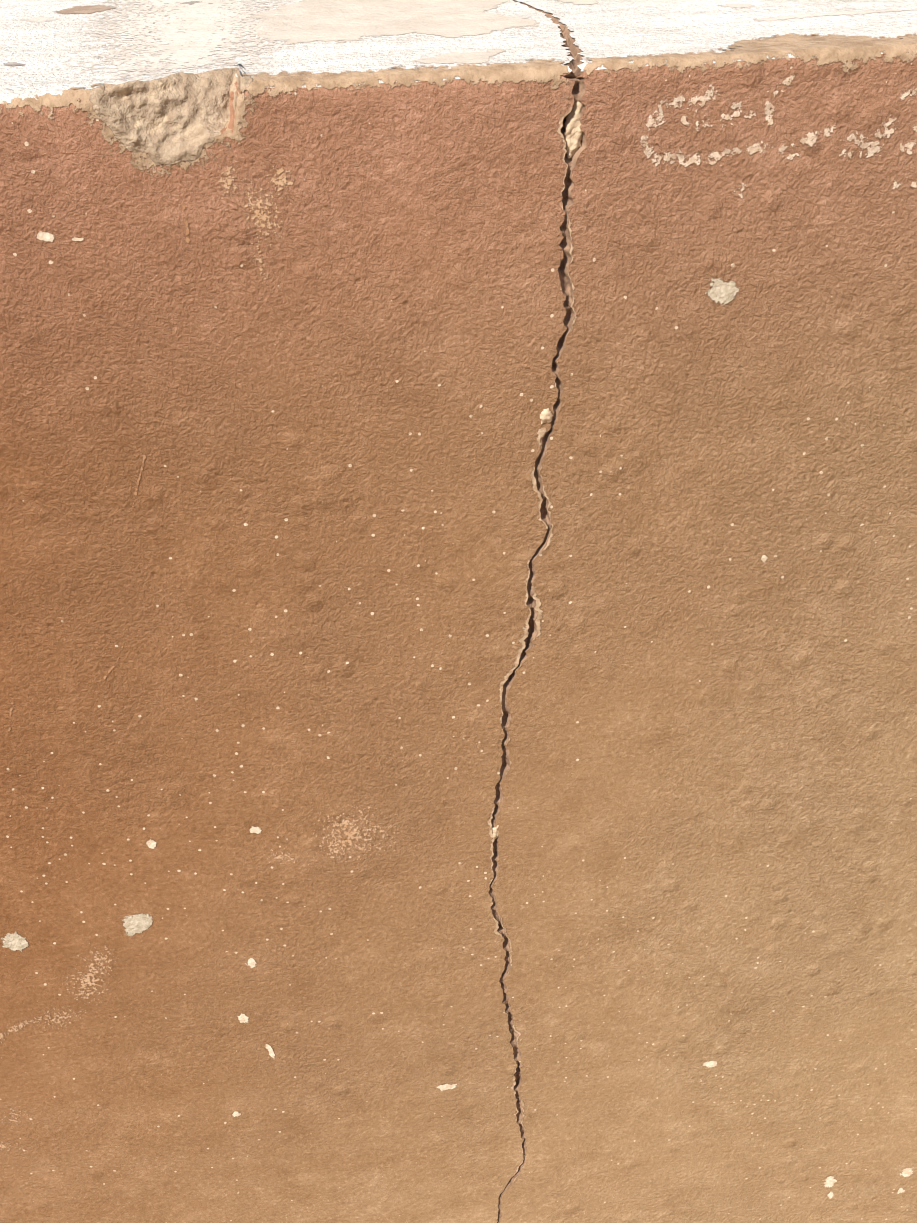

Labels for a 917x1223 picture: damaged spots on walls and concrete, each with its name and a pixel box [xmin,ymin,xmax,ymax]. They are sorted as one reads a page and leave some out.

spalling [21,0,539,177]
peeling [639,76,917,167]
crack [488,1,587,1223]